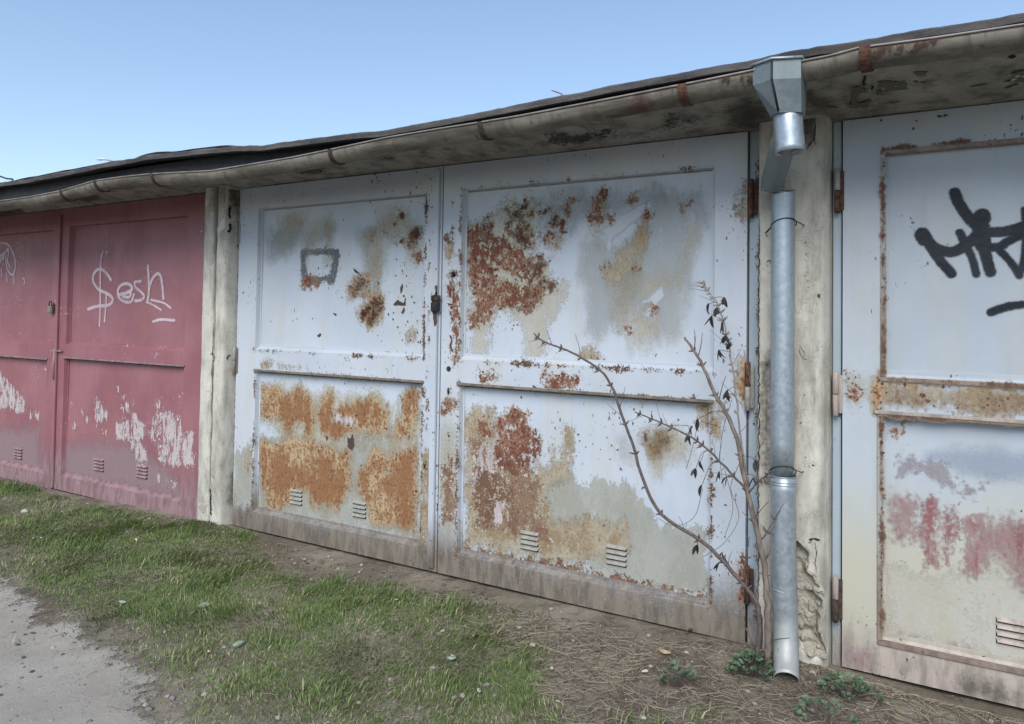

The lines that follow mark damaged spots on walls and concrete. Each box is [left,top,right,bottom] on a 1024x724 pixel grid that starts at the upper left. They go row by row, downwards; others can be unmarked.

corrosion [933,138,971,147]
corrosion [347,207,424,332]
corrosion [431,184,616,366]
corrosion [598,190,654,288]
peeling [0,371,41,421]
peeling [69,386,196,492]
corrosion [247,360,429,545]
corrosion [440,397,632,567]
corrosion [643,430,686,467]
corrosion [843,144,1024,631]
spalling [796,539,827,661]